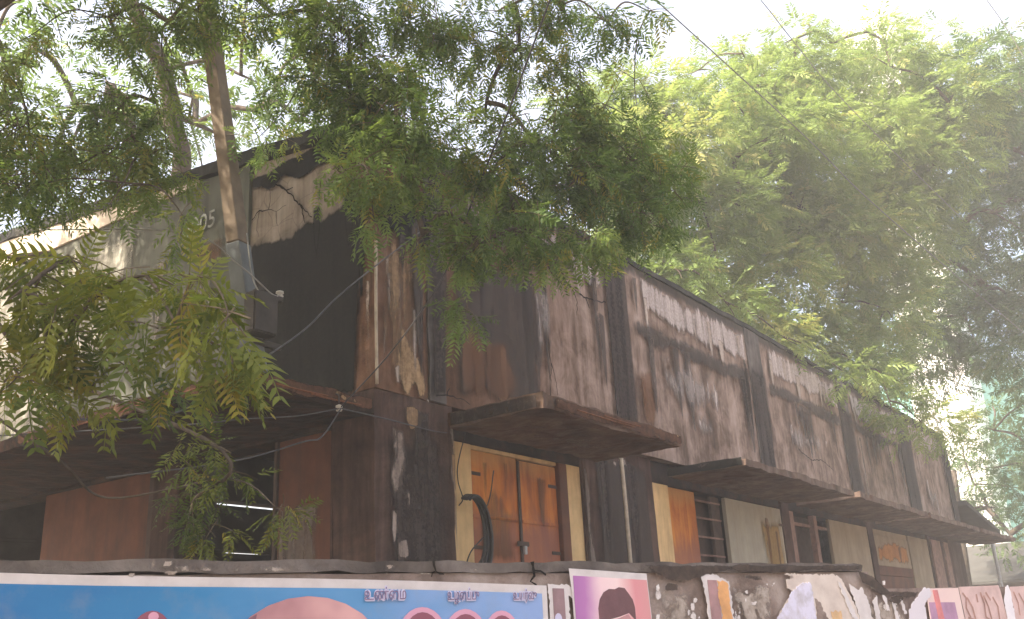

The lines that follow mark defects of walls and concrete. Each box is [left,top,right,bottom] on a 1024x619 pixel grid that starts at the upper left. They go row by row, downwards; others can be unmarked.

crack [252,184,312,235]
peeling [642,280,745,363]
spalling [384,242,429,505]
damp [591,255,923,511]
flaking render [152,561,188,575]
spalling [386,511,409,574]
flaking render [870,581,903,619]